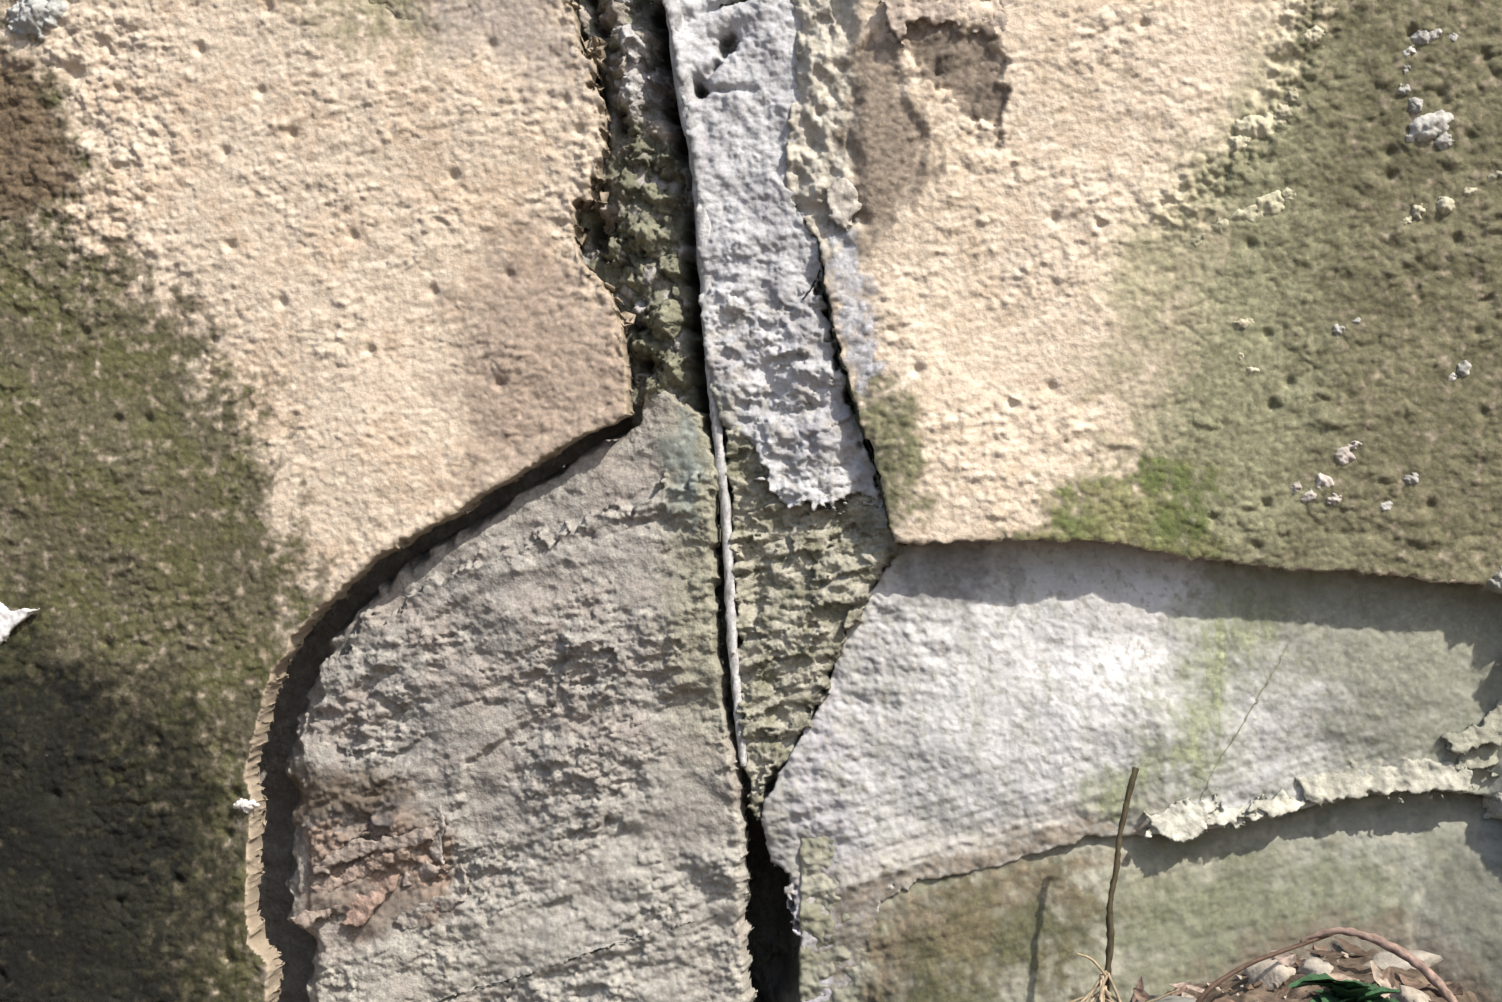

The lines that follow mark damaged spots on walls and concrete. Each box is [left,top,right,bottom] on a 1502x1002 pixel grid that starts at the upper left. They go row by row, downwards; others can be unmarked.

damp [0,52,75,216]
peeling [827,177,862,231]
peeling [878,0,1015,149]
damp [1190,187,1297,247]
damp [1228,88,1299,152]
efflorescence [1396,28,1459,151]
crack [570,0,743,726]
crack [802,240,891,530]
damp [1290,440,1362,506]
spalling [233,384,1502,1002]
damp [0,617,238,1002]
crack [439,766,801,1002]